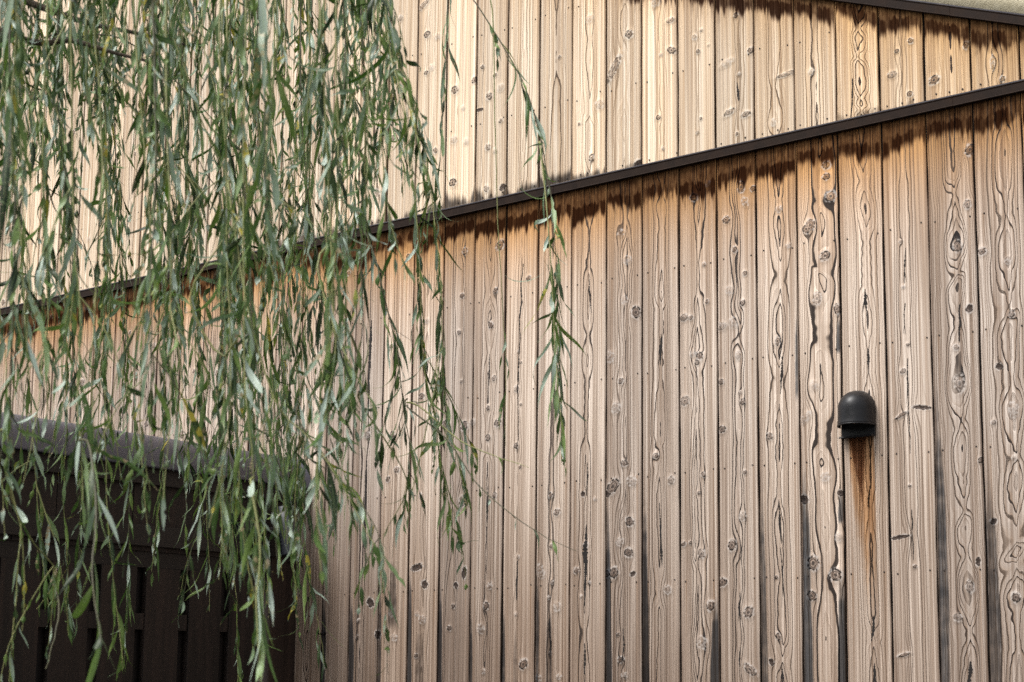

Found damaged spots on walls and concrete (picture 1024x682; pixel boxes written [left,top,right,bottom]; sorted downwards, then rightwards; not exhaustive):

corrosion [850,437,865,488]